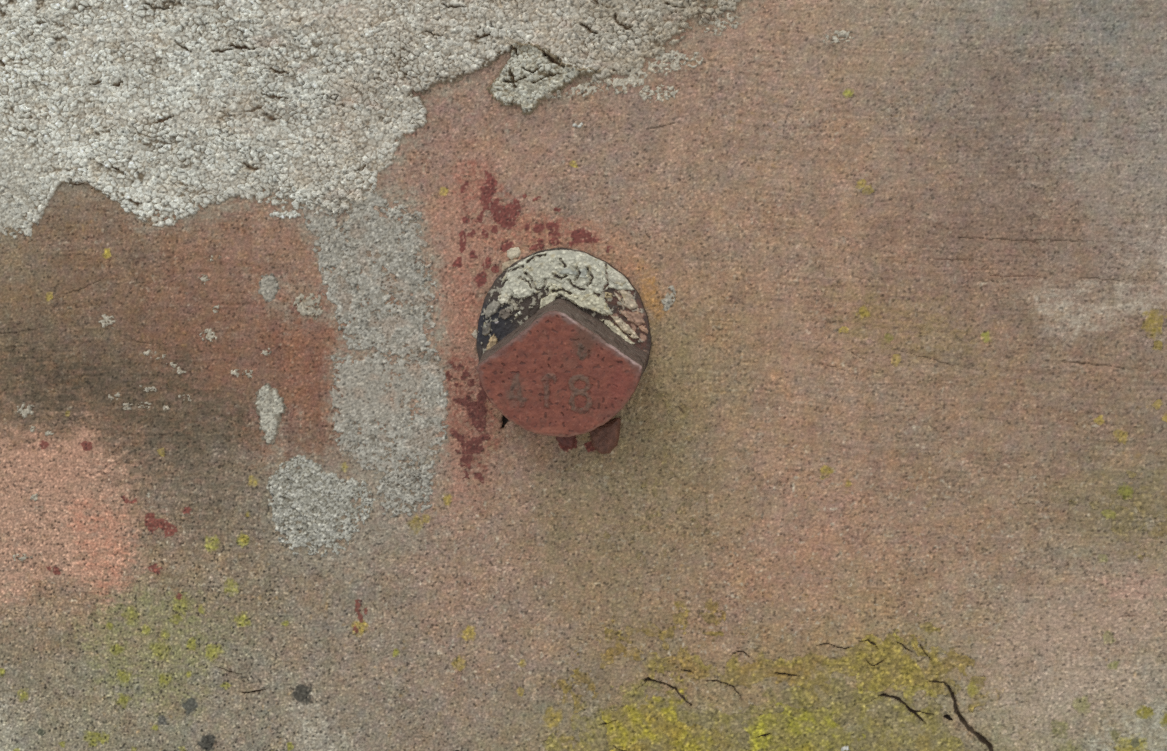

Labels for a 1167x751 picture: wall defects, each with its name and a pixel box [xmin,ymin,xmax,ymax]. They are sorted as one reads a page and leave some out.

flaking render [0,0,741,239]
corrosion [428,149,674,520]
crack [642,669,741,706]
crack [819,639,994,751]